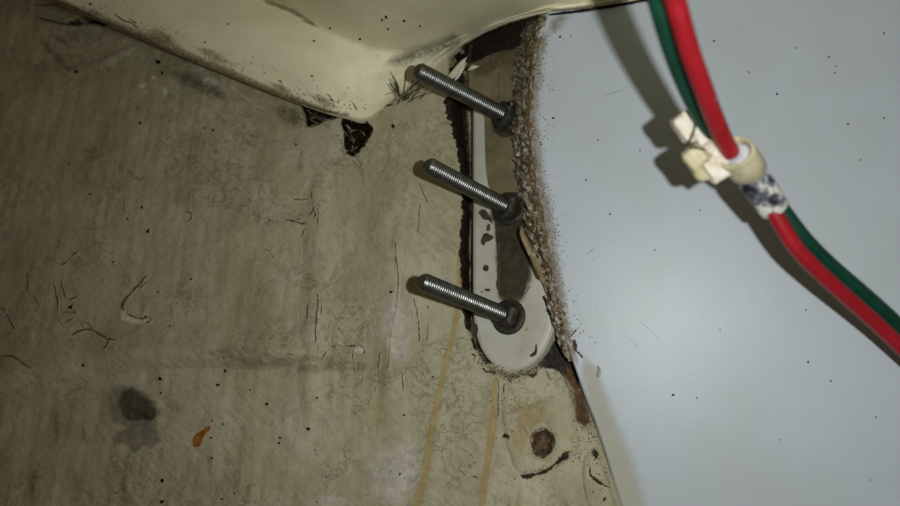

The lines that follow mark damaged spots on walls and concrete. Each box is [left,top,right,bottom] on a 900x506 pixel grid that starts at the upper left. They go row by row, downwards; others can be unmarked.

peeling [448,43,517,103]
peeling [484,114,518,195]
corrosion [531,18,596,358]
peeling [479,209,548,301]
damp [112,389,156,448]
corrosion [566,367,589,426]